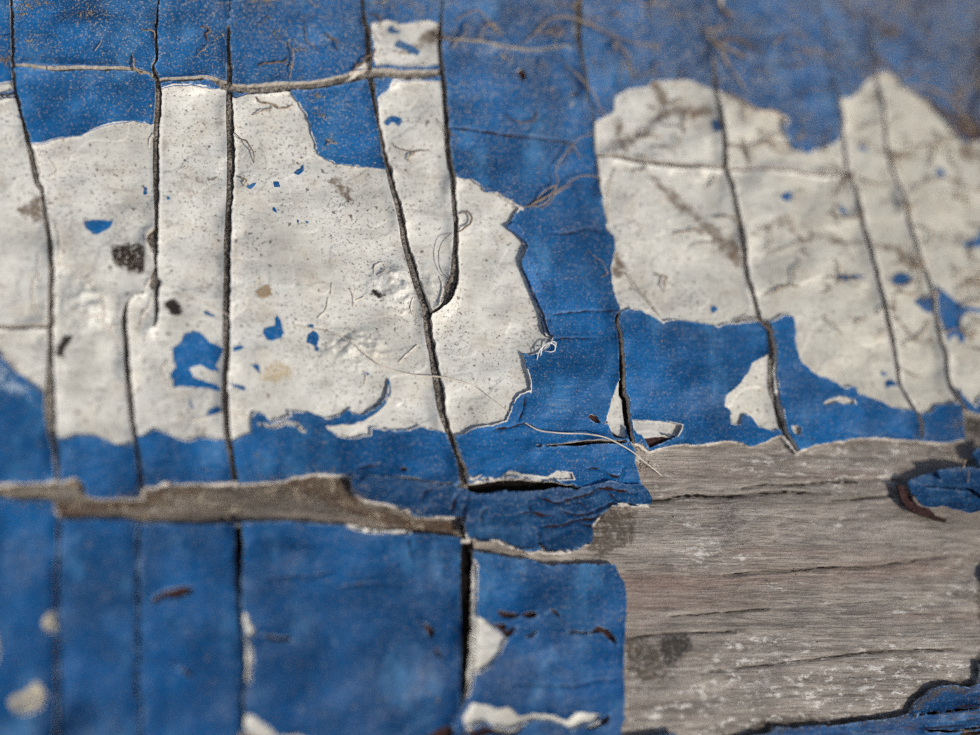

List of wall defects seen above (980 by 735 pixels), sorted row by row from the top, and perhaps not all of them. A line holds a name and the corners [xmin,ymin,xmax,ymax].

peeling [370,21,438,73]
crack [0,0,60,486]
peeling [0,81,555,446]
crack [122,0,899,735]
peeling [594,73,980,415]
crack [905,214,965,440]
peeling [0,349,980,735]
crack [717,649,943,670]
crack [782,558,927,572]
crack [919,709,980,733]